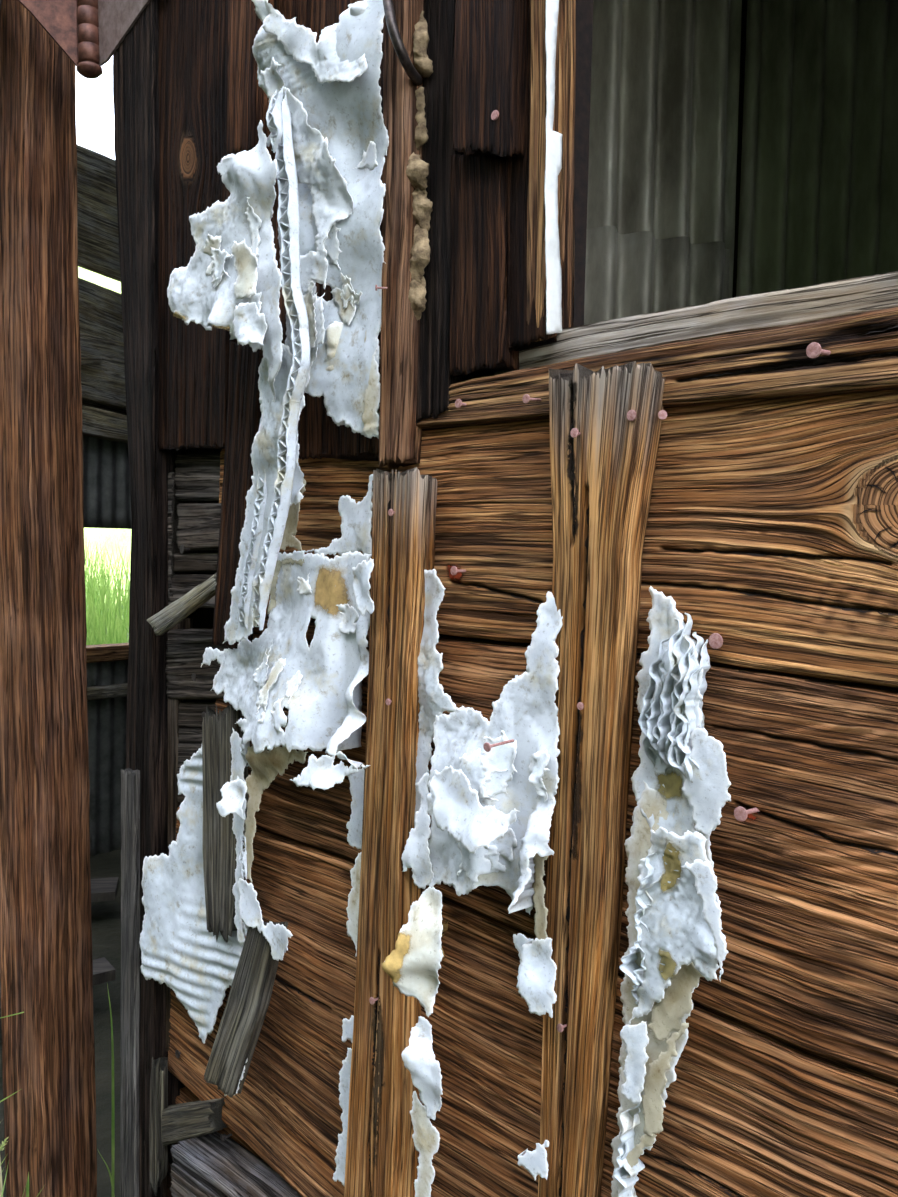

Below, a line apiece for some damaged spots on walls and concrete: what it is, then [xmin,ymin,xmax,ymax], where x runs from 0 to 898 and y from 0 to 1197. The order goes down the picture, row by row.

peeling [544,0,562,334]
crack [673,467,898,565]
crack [641,582,898,615]